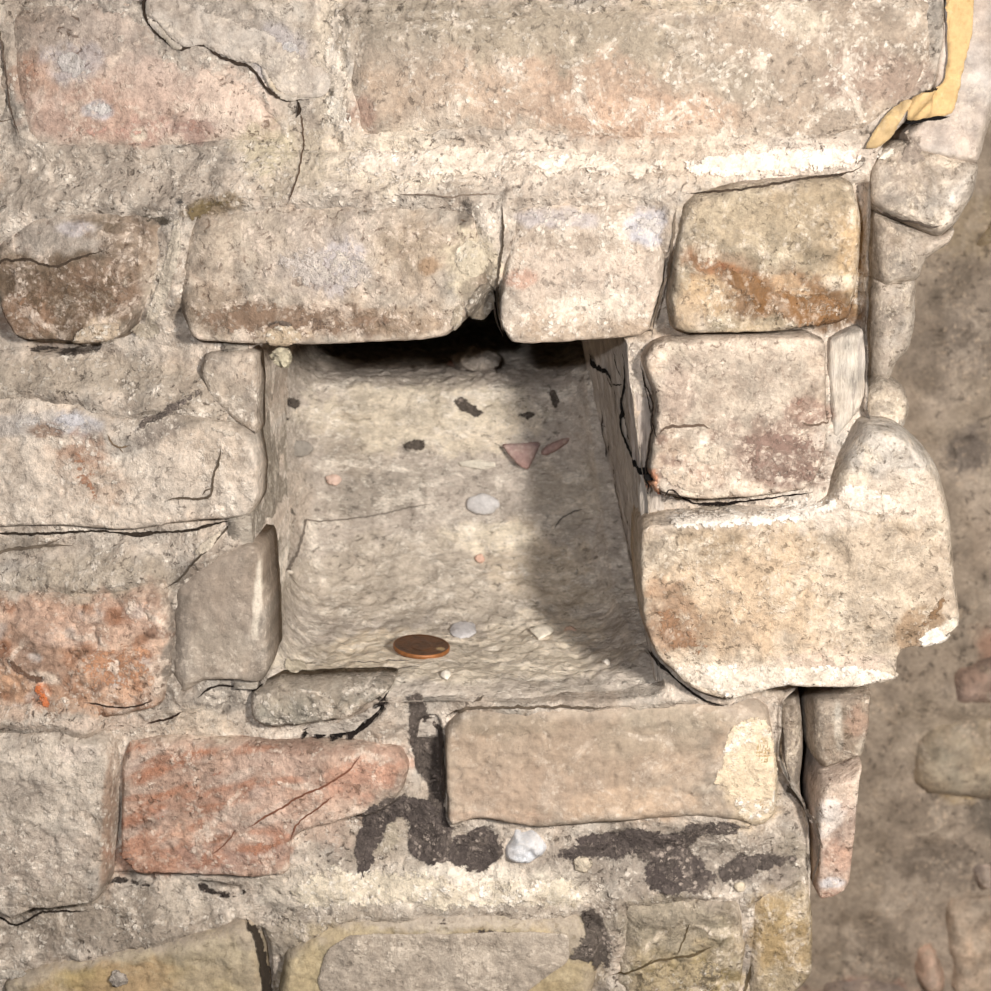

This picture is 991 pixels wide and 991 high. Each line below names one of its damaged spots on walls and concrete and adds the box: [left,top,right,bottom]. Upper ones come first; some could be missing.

crack [142,0,309,205]
crack [0,517,245,588]
crack [167,446,222,501]
crack [588,351,812,561]
crack [803,417,831,426]
crack [356,659,422,669]
crack [212,691,389,854]
leakage [291,692,615,971]
leakage [558,717,819,897]
crack [246,919,272,991]